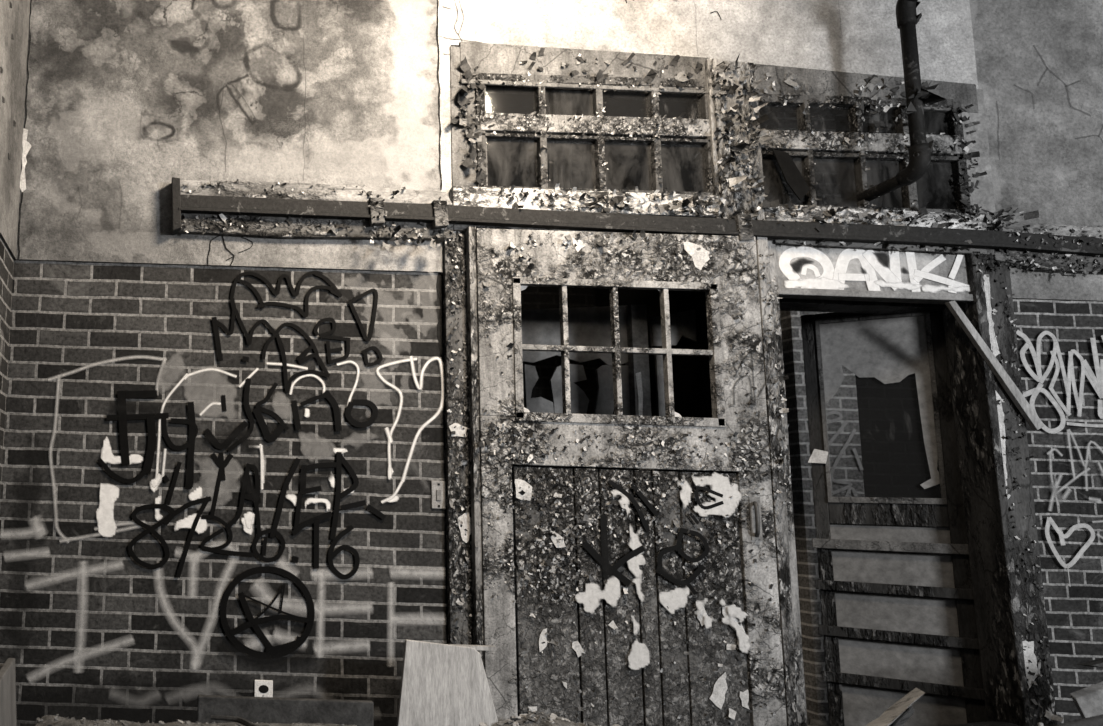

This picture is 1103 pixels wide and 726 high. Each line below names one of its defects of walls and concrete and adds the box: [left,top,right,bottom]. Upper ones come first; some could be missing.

leakage [36,41,82,76]
leakage [136,8,303,138]
leakage [269,0,301,35]
peeling [181,48,1103,645]
peeling [995,390,1063,726]
peeling [521,626,558,657]
peeling [559,604,639,719]
peeling [658,641,781,724]
peeling [715,582,778,661]